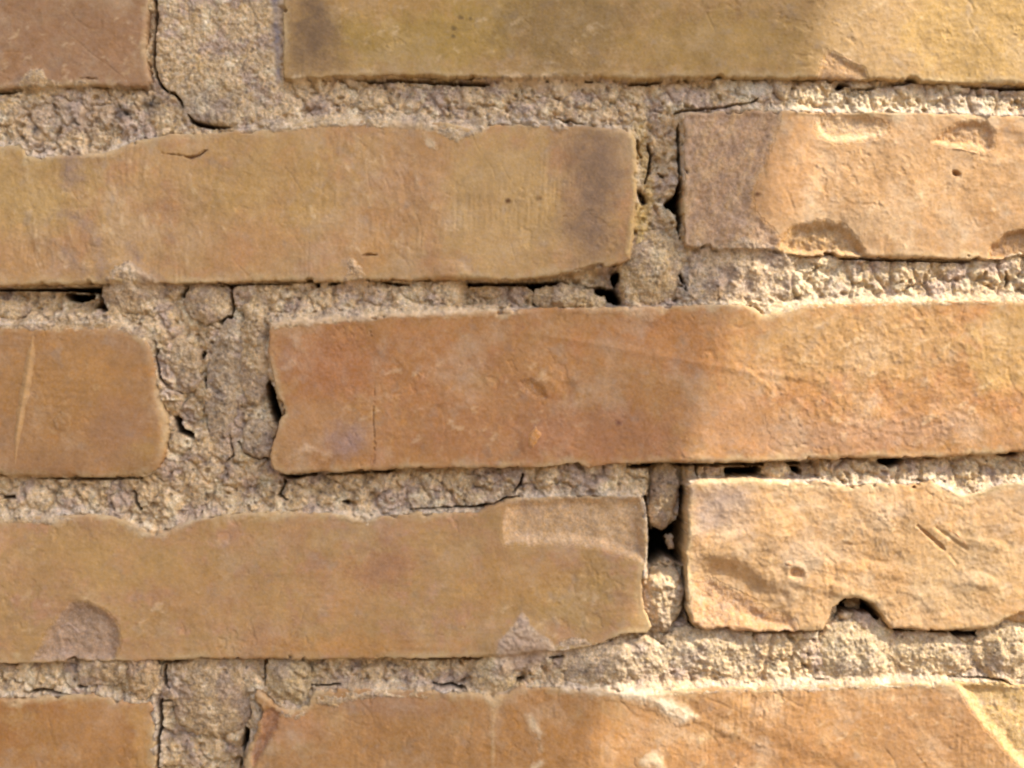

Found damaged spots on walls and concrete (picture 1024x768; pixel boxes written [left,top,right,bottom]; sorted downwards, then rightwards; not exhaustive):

crack [152,0,232,161]
crack [154,346,184,394]
crack [226,434,276,461]
crack [409,473,525,511]
spalling [29,600,122,663]
spalling [832,597,876,622]